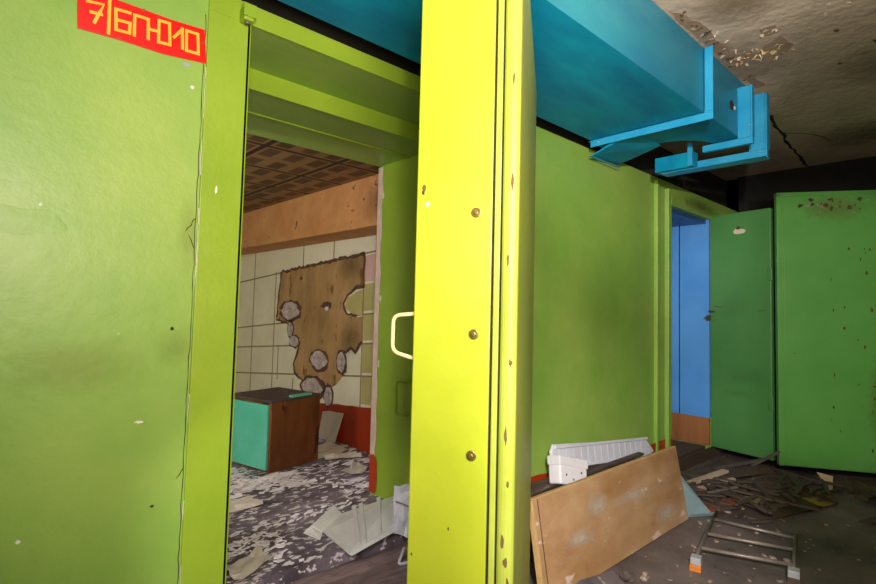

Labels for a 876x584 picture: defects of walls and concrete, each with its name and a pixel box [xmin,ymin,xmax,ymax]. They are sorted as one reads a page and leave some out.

peeling [670,11,796,88]
crack [770,115,830,166]